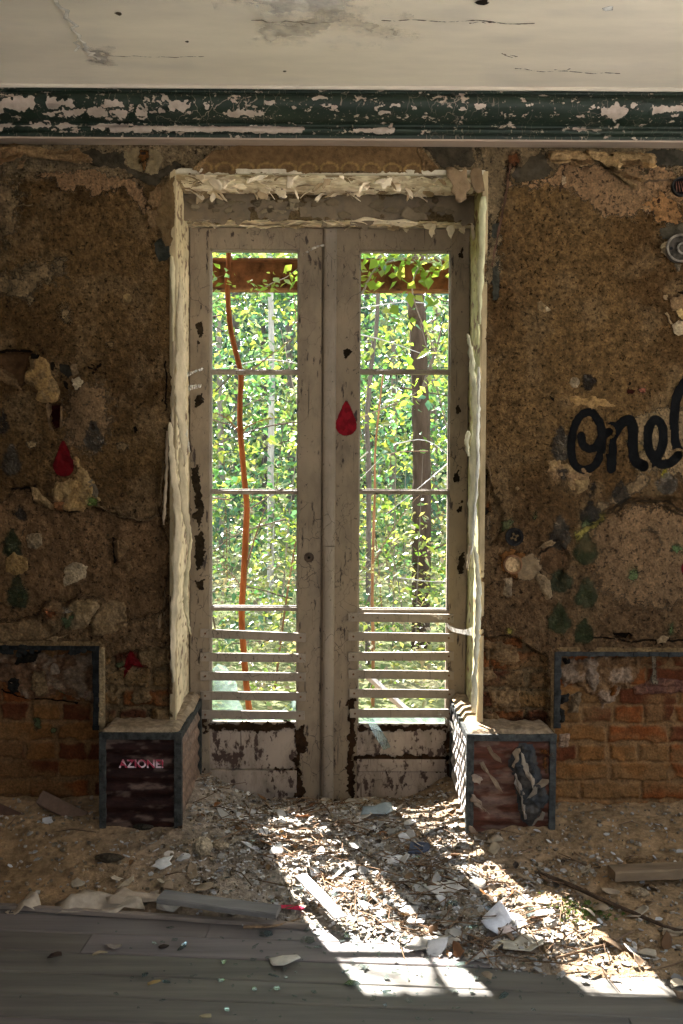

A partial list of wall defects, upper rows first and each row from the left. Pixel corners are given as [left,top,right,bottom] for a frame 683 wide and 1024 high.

crack [468,18,534,26]
crack [502,53,620,74]
peeling [0,93,305,134]
peeling [352,103,417,134]
peeling [562,102,638,132]
peeling [652,105,683,117]
flaking render [0,146,683,725]